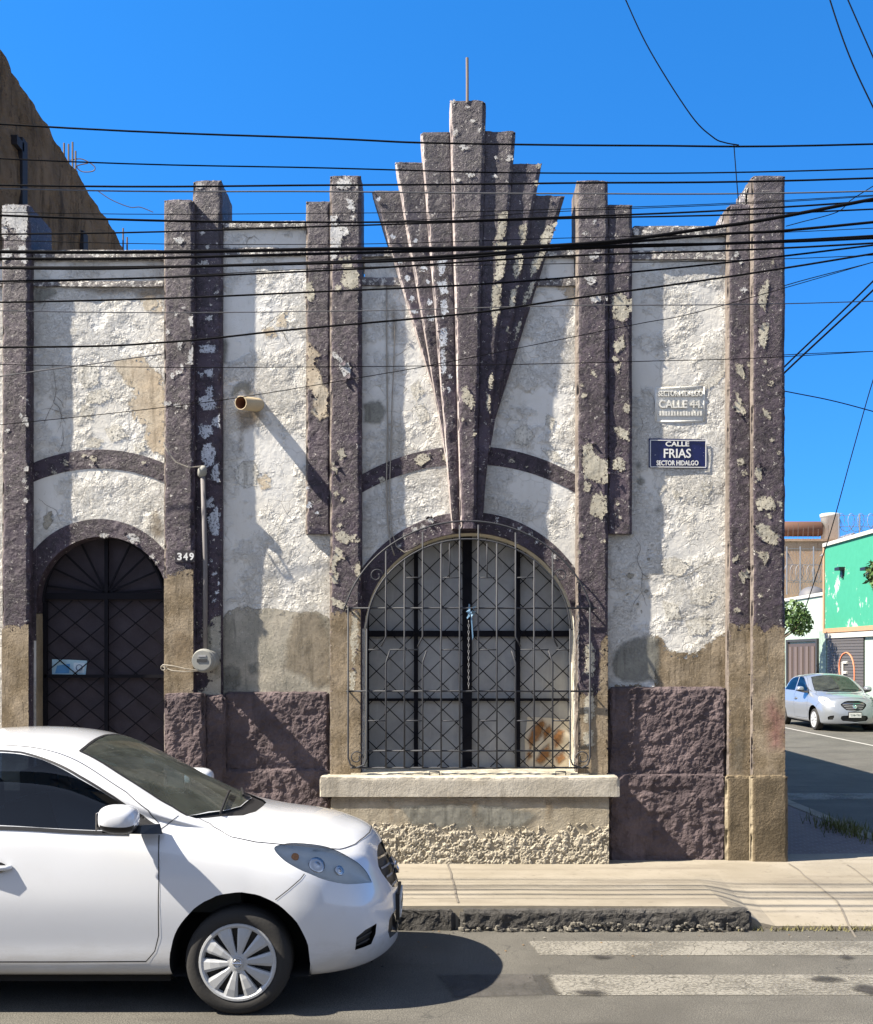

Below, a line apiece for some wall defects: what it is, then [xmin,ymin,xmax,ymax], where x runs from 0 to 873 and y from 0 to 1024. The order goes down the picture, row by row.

peeling [490,211,557,340]
peeling [584,274,632,373]
peeling [741,280,770,365]
crack [43,371,65,452]
flaking render [78,329,220,483]
flaking render [306,342,354,420]
peeling [581,439,626,520]
peeling [329,523,360,584]
peeling [732,496,783,584]
leakage [286,613,329,686]
flaking render [578,585,785,776]
rust [527,721,566,763]